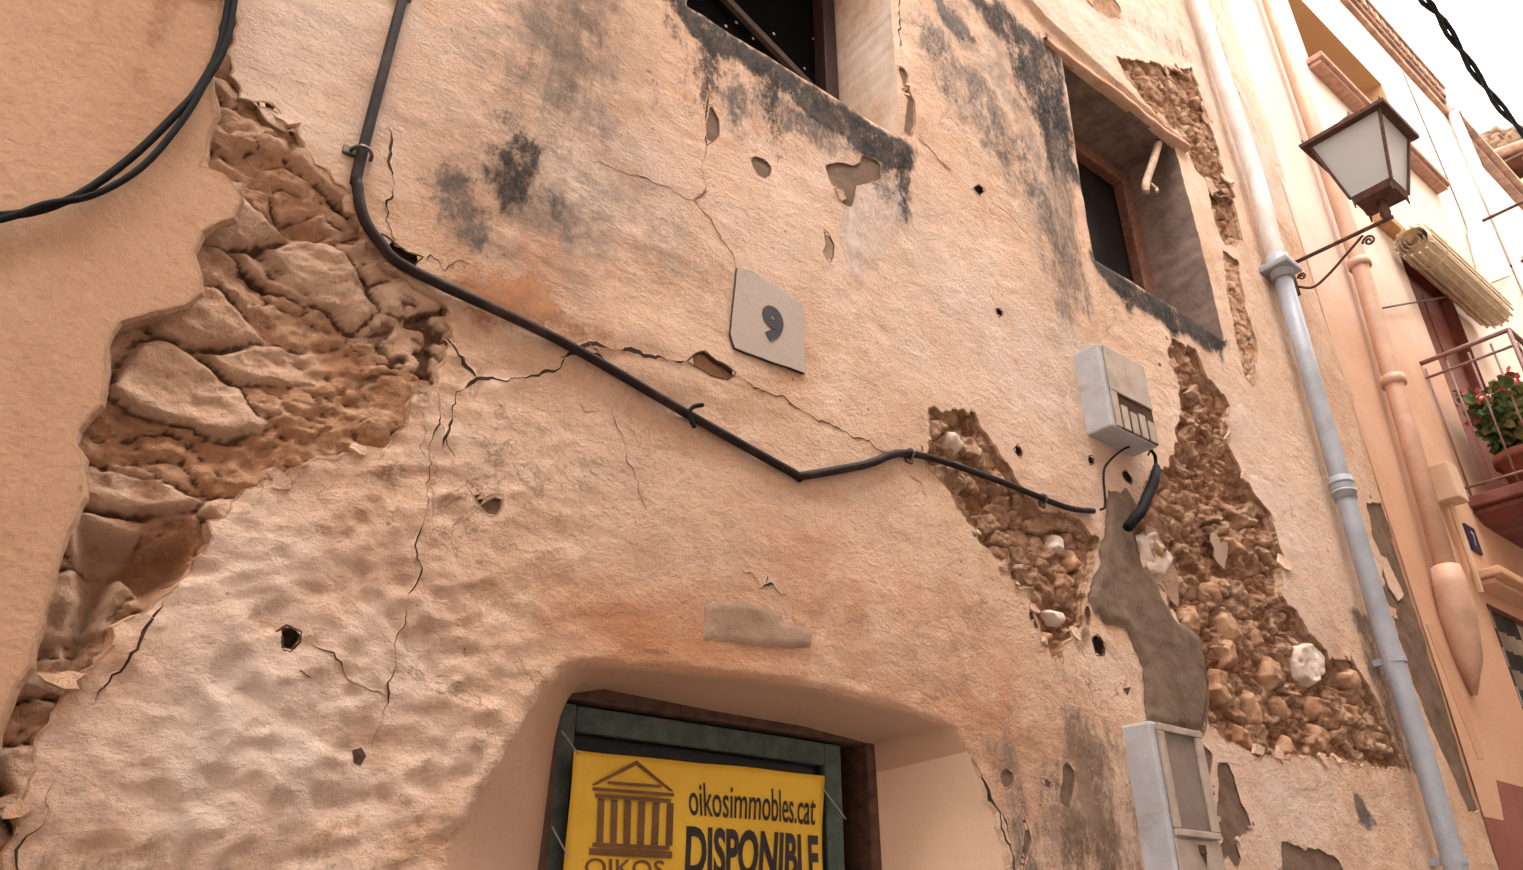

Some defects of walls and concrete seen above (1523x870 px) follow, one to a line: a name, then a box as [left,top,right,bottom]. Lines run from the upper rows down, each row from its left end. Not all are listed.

damp [417,111,564,249]
damp [664,0,917,274]
peeling [825,155,881,207]
damp [920,0,1091,318]
damp [1117,276,1134,312]
spalling [1116,55,1258,387]
crack [94,601,163,705]
spalling [0,17,454,870]
crack [300,336,690,748]
spalling [921,405,1100,664]
spalling [1134,336,1407,870]
crack [11,782,55,870]